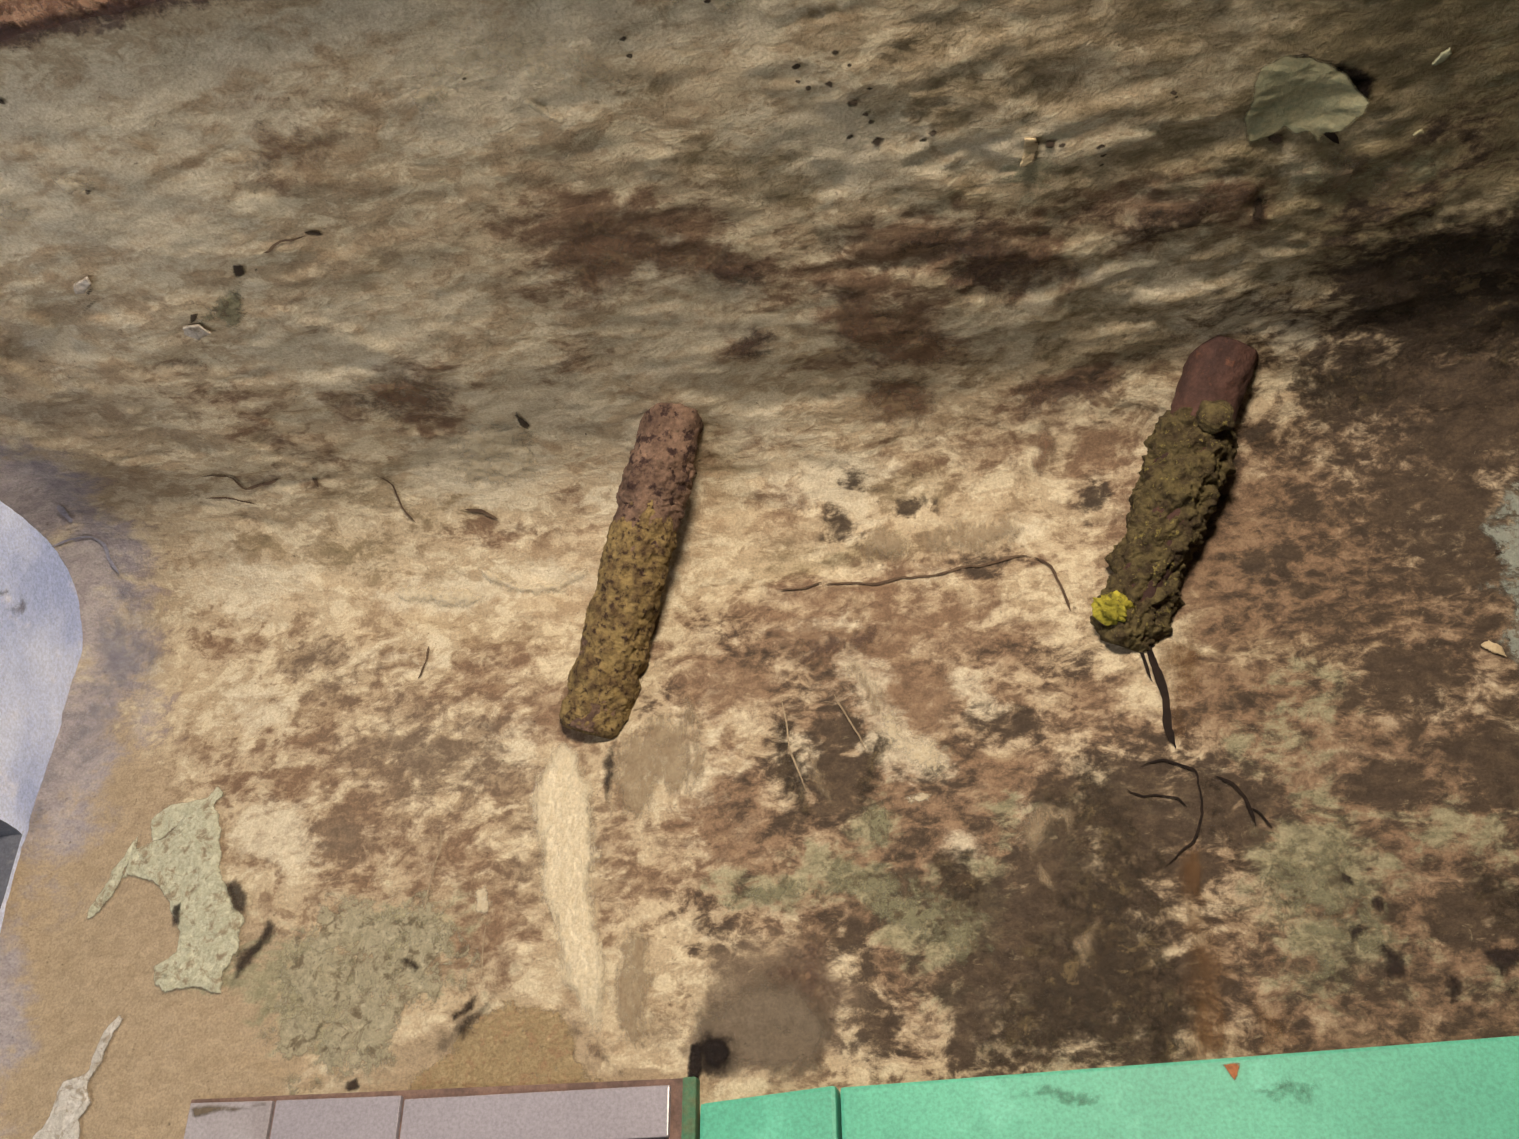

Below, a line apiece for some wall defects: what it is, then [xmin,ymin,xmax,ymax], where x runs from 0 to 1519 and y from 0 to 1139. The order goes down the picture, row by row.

rust [0,0,209,51]
peeling [1244,54,1375,145]
damp [728,329,773,357]
damp [839,291,966,422]
damp [898,229,1079,299]
damp [1354,219,1519,373]
damp [778,722,829,816]
damp [789,627,949,800]
peeling [87,787,273,993]
damp [983,770,1193,1058]
damp [1486,947,1519,992]
peeling [32,1016,122,1139]